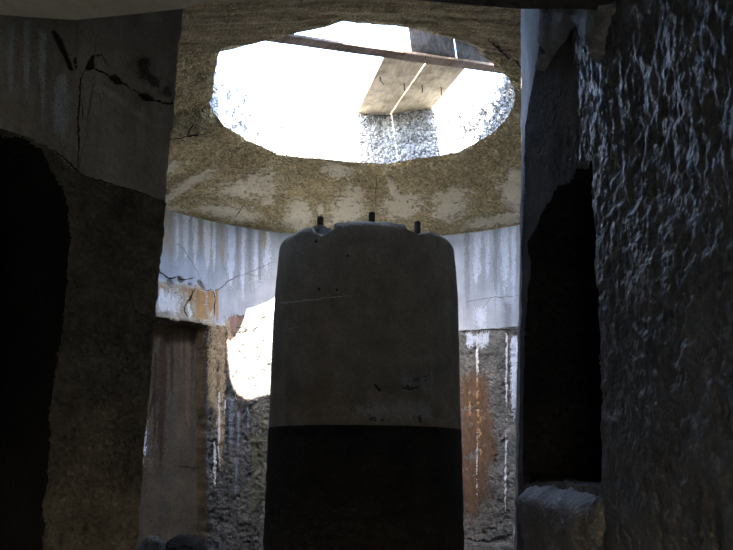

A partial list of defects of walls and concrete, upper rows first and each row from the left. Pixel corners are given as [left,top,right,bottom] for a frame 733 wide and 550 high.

crack [55,54,164,201]
damp [158,286,193,318]
spalling [167,275,205,290]
crack [160,244,273,330]
damp [163,212,272,305]
damp [463,162,526,420]
corrosion [146,282,254,479]
damp [213,393,265,536]
corrosion [460,368,501,539]